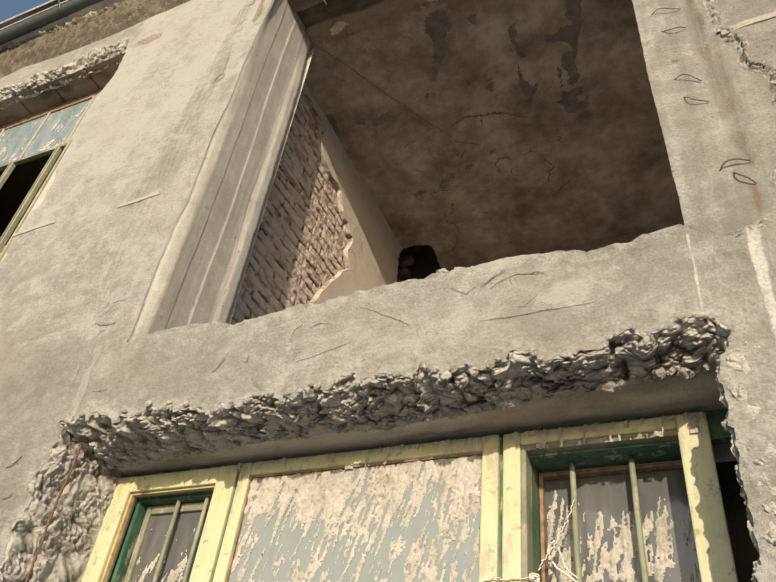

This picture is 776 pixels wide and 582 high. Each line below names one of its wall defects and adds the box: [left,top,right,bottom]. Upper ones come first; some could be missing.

spalling [0,0,191,110]
peeling [423,10,452,81]
peeling [507,23,540,104]
flaking render [230,88,353,325]
spalling [397,245,435,282]
water stain [745,225,776,338]
spalling [0,310,776,582]